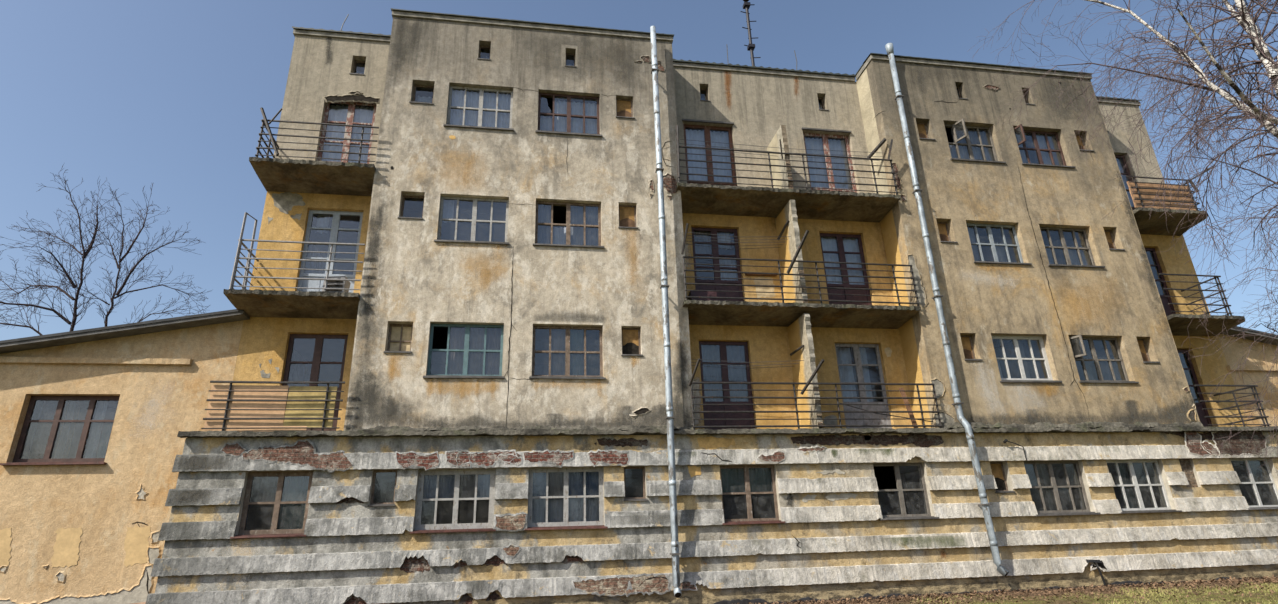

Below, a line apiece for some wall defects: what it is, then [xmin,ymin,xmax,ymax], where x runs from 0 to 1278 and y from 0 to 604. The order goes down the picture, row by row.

spalling [757,377,956,464]
spalling [1160,386,1267,457]
spalling [220,439,354,473]
spalling [394,438,648,471]
spalling [135,484,148,501]
peeling [0,529,162,604]
spalling [399,556,430,573]
spalling [561,555,583,564]
spalling [571,573,698,597]